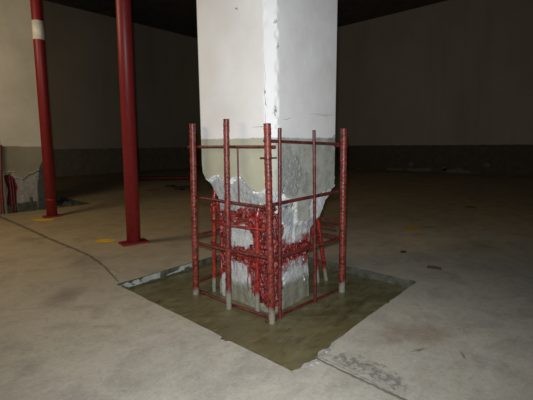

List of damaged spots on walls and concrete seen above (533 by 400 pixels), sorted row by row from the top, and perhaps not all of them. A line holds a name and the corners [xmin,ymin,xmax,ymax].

spalling [0,145,39,215]
crack [0,216,118,281]
corrosion [210,202,311,309]
spalling [206,143,333,312]